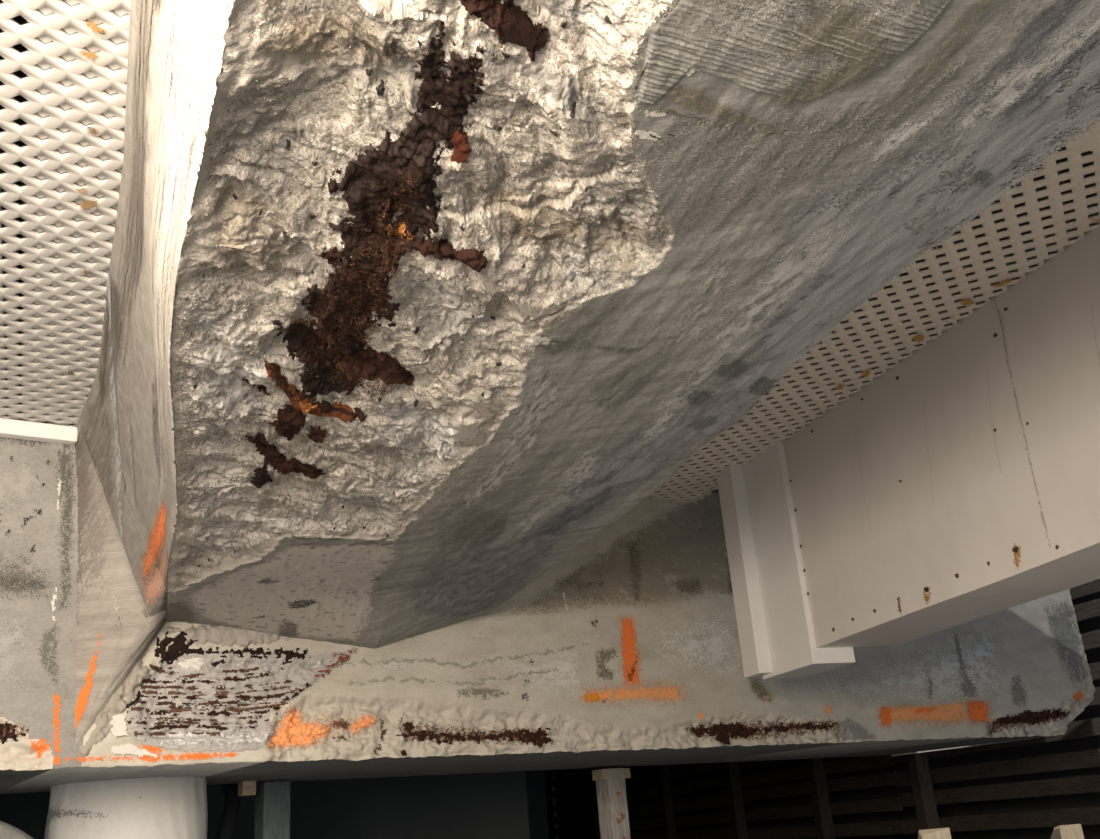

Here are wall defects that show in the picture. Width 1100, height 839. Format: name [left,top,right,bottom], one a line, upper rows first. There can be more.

corrosion [241,0,547,489]
spalling [167,0,676,595]
corrosion [0,719,30,744]
corrosion [127,631,357,737]
corrosion [373,718,553,758]
spalling [125,643,862,762]
corrosion [685,719,840,745]
corrosion [986,708,1072,737]